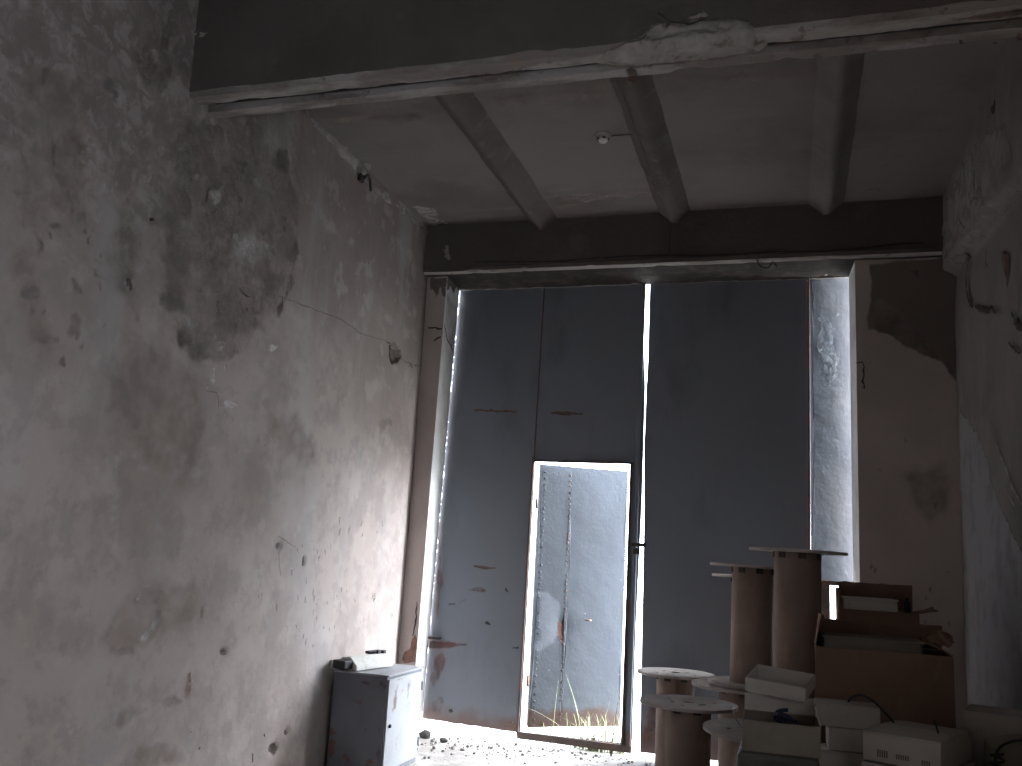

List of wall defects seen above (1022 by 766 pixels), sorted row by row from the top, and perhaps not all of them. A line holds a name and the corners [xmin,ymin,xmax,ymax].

water stain [163,120,298,357]
corrosion [429,641,465,678]